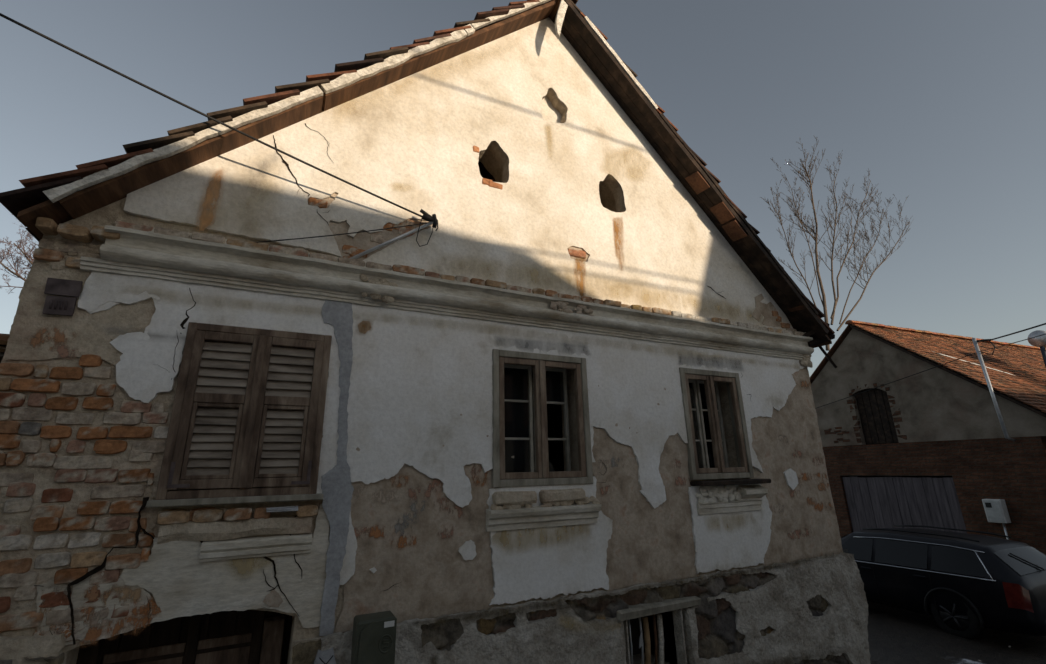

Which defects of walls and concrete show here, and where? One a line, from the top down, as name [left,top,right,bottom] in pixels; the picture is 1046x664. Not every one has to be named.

leakage [199,174,221,231]
crack [273,135,330,225]
flaking render [308,193,338,208]
flaking render [329,219,433,261]
flaking render [0,247,229,649]
flaking render [333,358,907,659]
crack [34,497,154,645]
crack [263,515,302,616]
spalling [292,638,322,664]
spalling [794,653,849,664]